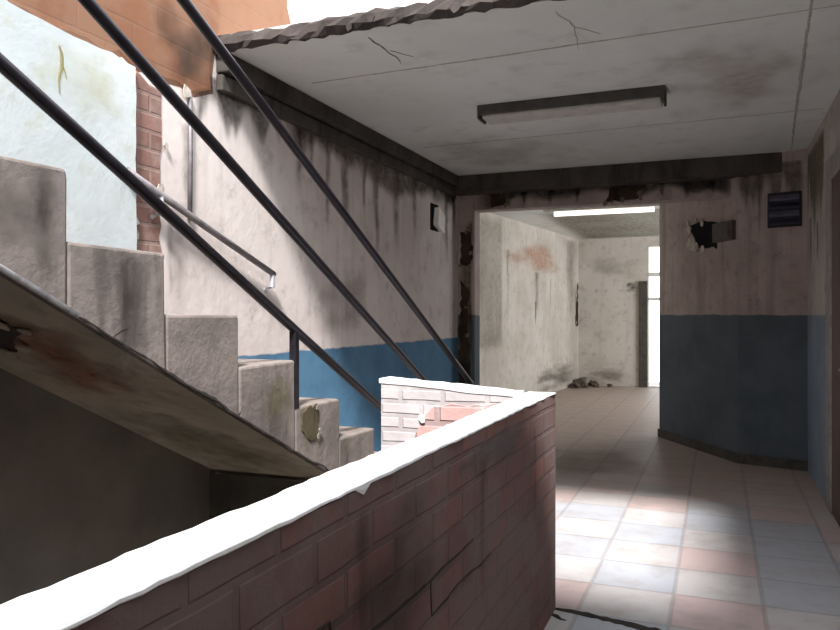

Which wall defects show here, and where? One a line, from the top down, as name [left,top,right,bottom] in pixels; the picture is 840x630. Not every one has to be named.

crack [556,12,600,49]
crack [368,37,413,64]
leakage [294,126,450,210]
peeling [603,185,643,206]
spalling [459,227,473,267]
spalling [686,217,717,253]
spalling [0,321,32,359]
spalling [457,280,471,384]
spalling [301,404,322,441]
crack [552,608,661,630]